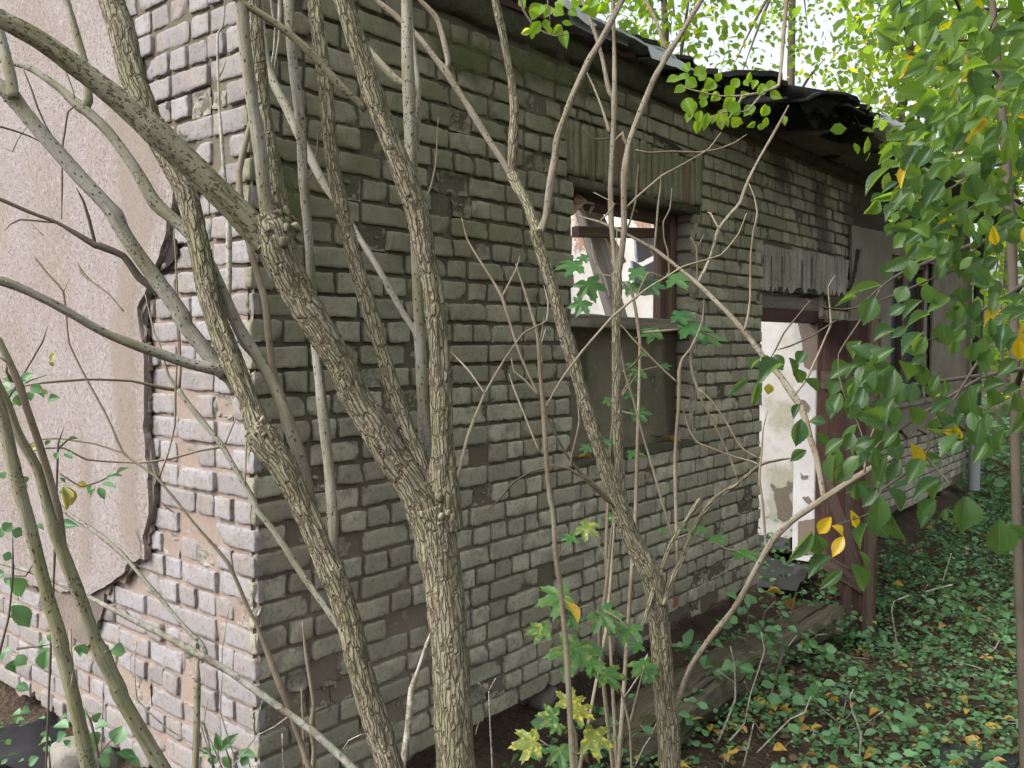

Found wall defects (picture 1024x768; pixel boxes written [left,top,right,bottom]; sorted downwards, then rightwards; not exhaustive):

peeling [798,316,828,370]
peeling [770,473,815,555]
peeling [54,584,115,648]